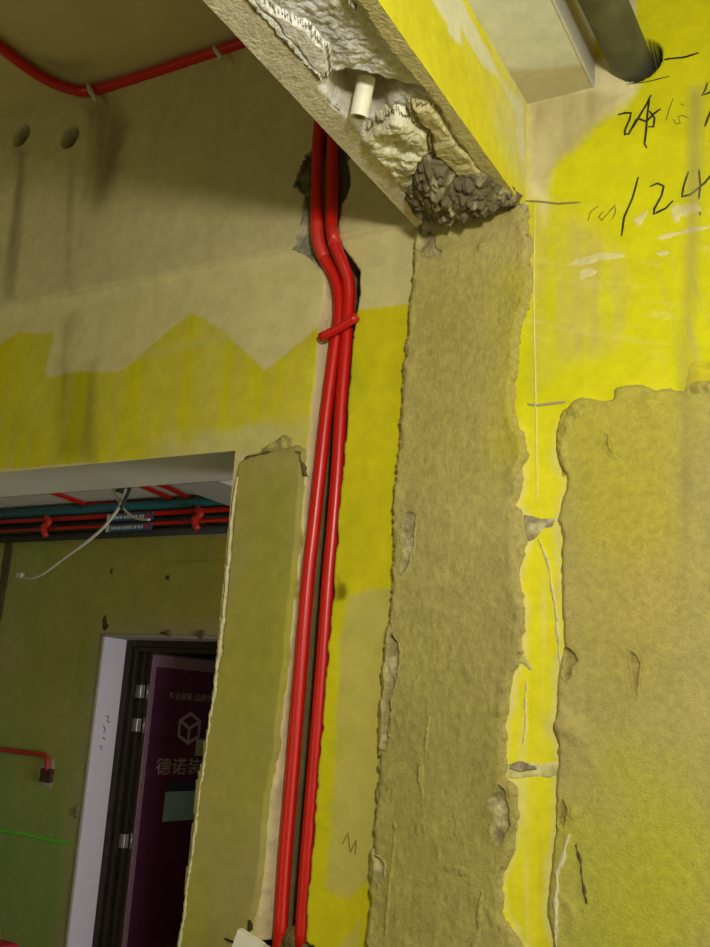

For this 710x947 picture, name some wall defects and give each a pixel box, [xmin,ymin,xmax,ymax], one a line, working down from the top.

spalling [251,0,528,260]
peeling [524,515,555,541]
spalling [378,624,403,751]
spalling [560,645,580,683]
spalling [627,647,642,702]